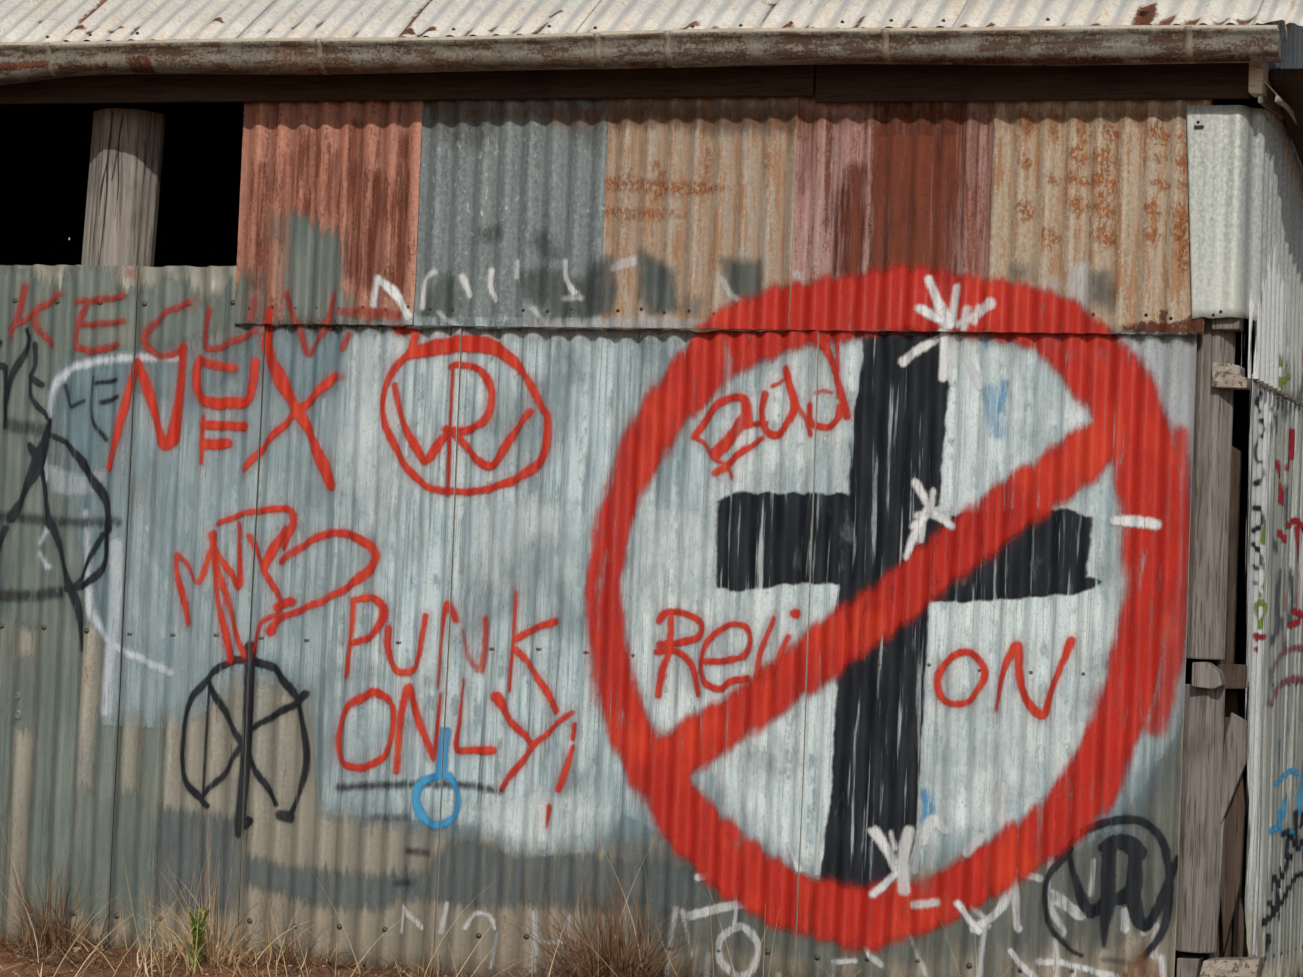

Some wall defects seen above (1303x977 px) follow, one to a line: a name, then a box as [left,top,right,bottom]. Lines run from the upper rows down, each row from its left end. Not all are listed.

rust [1132,3,1255,25]
rust [343,121,407,292]
rust [605,162,725,220]
rust [835,102,980,281]
rust [1048,122,1118,245]
rust [1143,121,1190,271]
rust [1123,310,1204,334]